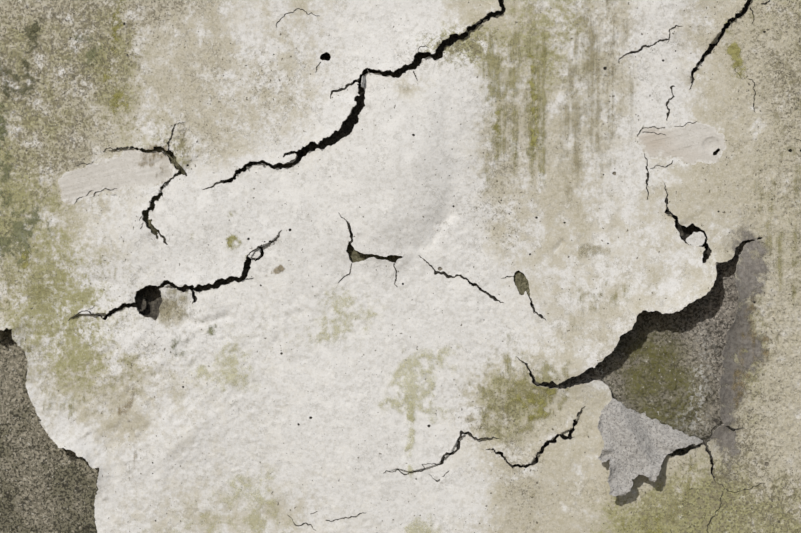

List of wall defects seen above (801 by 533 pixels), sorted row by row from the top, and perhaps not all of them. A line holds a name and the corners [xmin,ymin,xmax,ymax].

crack [77,122,187,245]
crack [203,0,506,190]
damp [483,33,519,101]
damp [491,45,546,174]
crack [637,0,770,263]
crack [68,230,282,321]
crack [420,256,504,303]
peeling [505,219,768,496]
spalling [0,328,99,533]
crack [384,406,585,482]
crack [699,418,761,532]